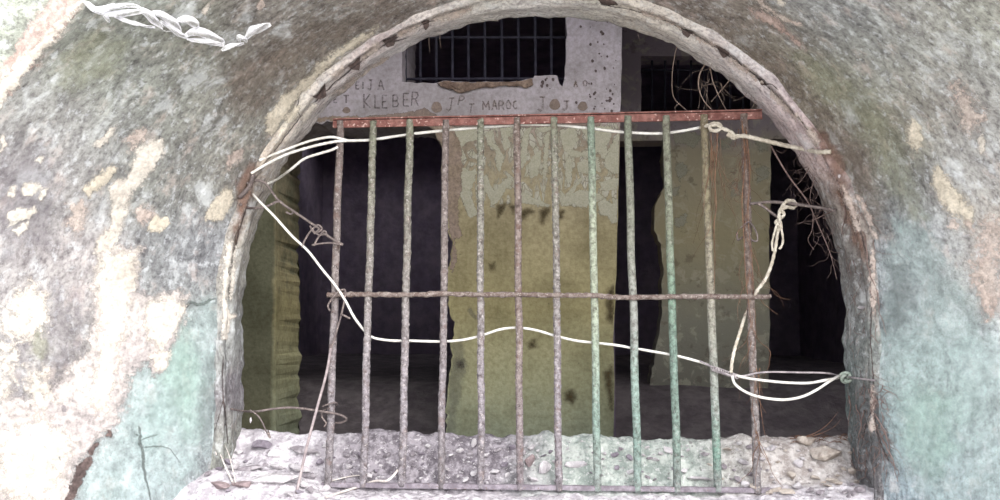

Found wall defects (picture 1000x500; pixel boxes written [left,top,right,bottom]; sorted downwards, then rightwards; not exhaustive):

flaking render [205,189,233,222]
flaking render [227,148,243,171]
peeling [372,22,620,273]
flaking render [0,127,190,500]
flaking render [220,241,237,340]